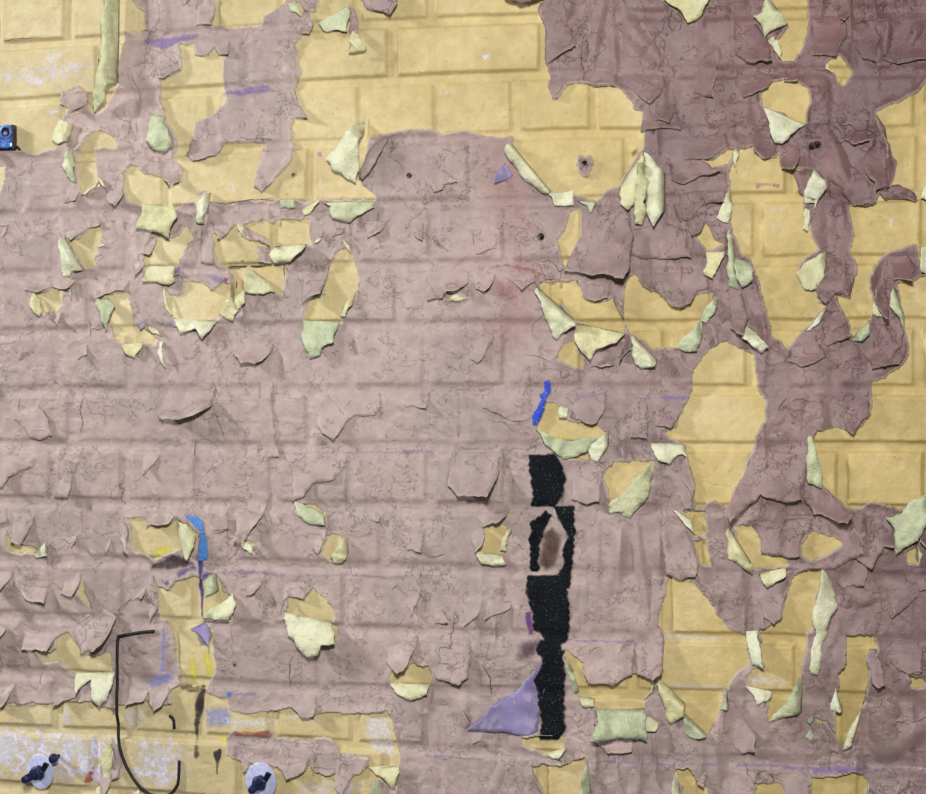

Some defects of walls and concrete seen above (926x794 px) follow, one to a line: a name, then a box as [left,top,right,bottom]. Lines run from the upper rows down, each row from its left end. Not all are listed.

peeling [0,0,146,153]
peeling [753,0,808,62]
peeling [62,0,725,369]
peeling [104,512,198,561]
peeling [158,388,216,420]
peeling [448,453,501,497]
peeling [470,505,512,566]
peeling [536,388,654,518]
peeling [563,69,926,754]
peeling [0,571,400,794]
peeling [385,635,471,701]
peeling [467,665,603,794]